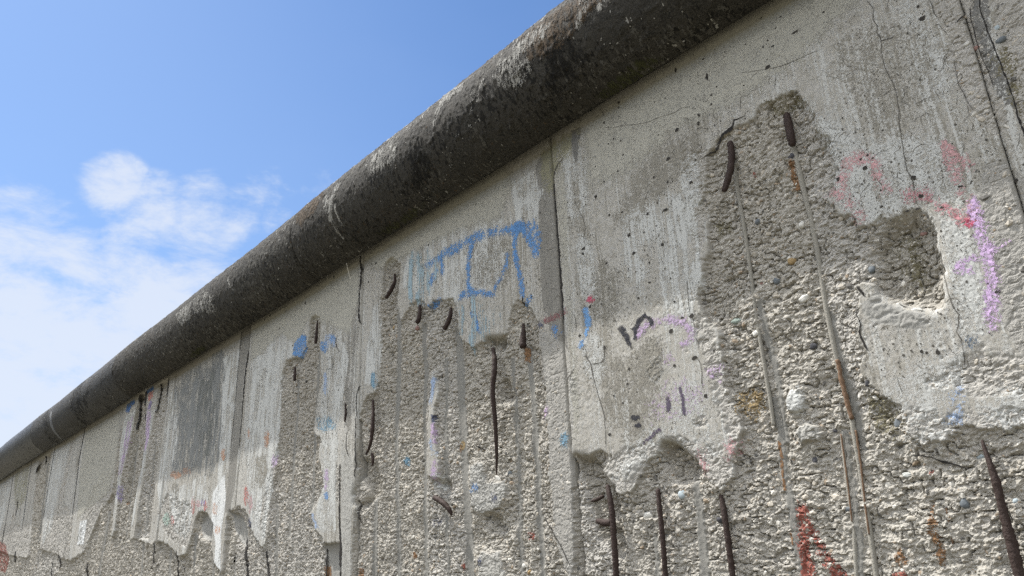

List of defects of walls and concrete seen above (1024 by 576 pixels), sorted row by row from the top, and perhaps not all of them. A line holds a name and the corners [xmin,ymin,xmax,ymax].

spalling [0,318,349,576]
spalling [351,87,1024,576]
crack [605,49,850,402]
crack [816,0,1024,205]